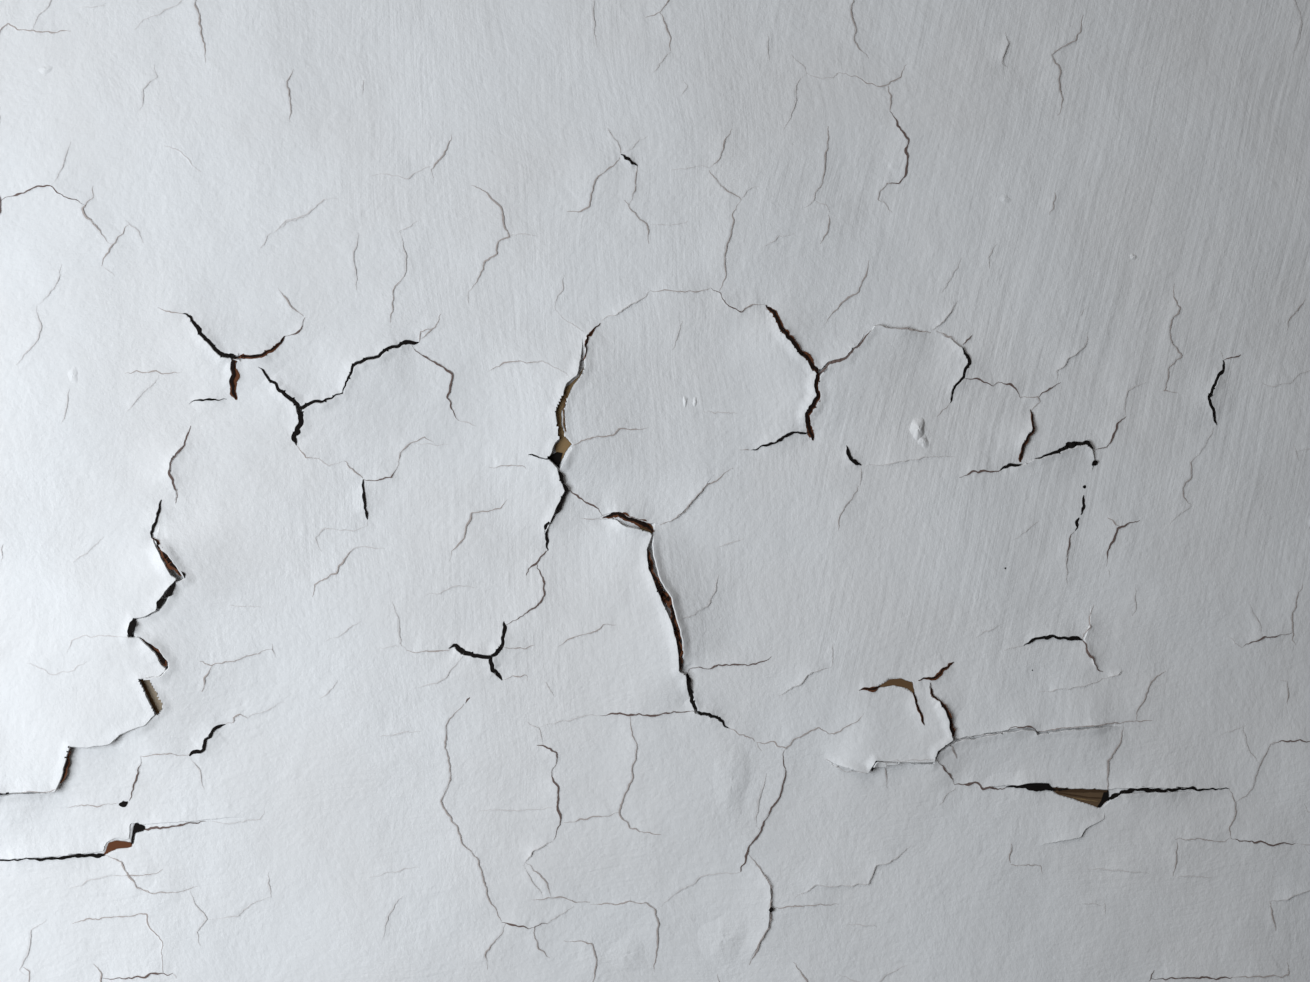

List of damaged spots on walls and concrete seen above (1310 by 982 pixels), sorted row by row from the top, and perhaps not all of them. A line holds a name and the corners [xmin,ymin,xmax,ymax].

crack [16,265,62,365]
peeling [0,421,285,870]
crack [26,221,474,714]
peeling [151,299,430,468]
crack [261,198,332,247]
crack [371,128,1241,981]
peeling [810,602,1198,846]
crack [913,662,1310,878]
crack [1228,585,1303,647]
crack [1150,965,1289,980]